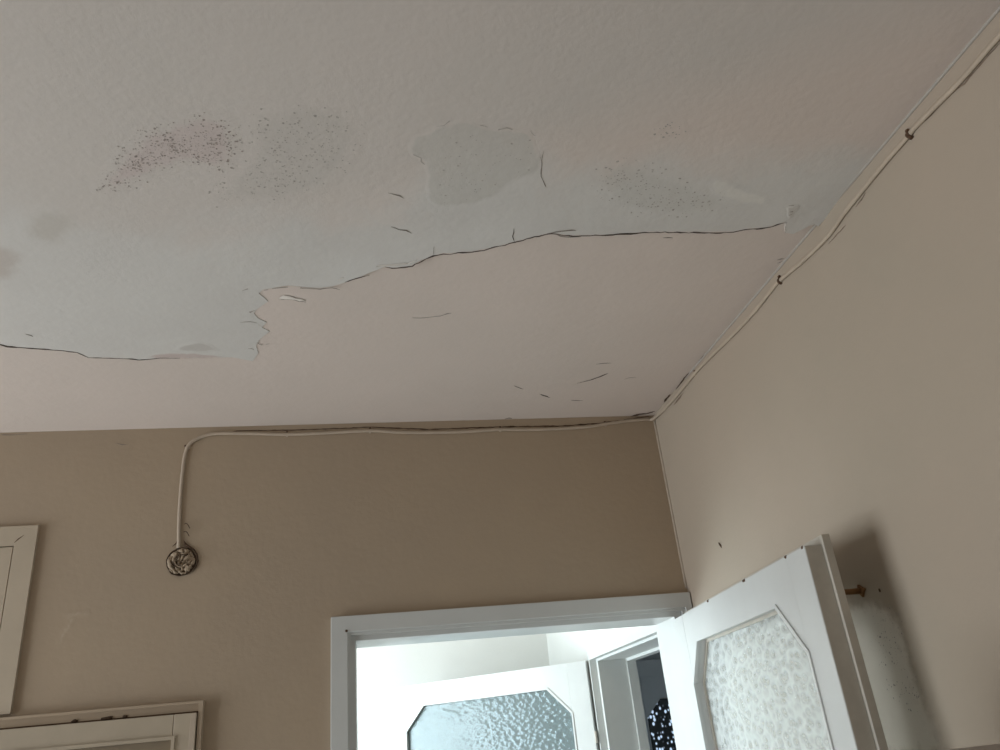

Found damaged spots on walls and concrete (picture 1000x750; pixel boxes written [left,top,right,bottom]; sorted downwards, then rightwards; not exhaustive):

leakage [90,94,372,208]
leakage [408,119,542,207]
flaking render [0,94,925,361]